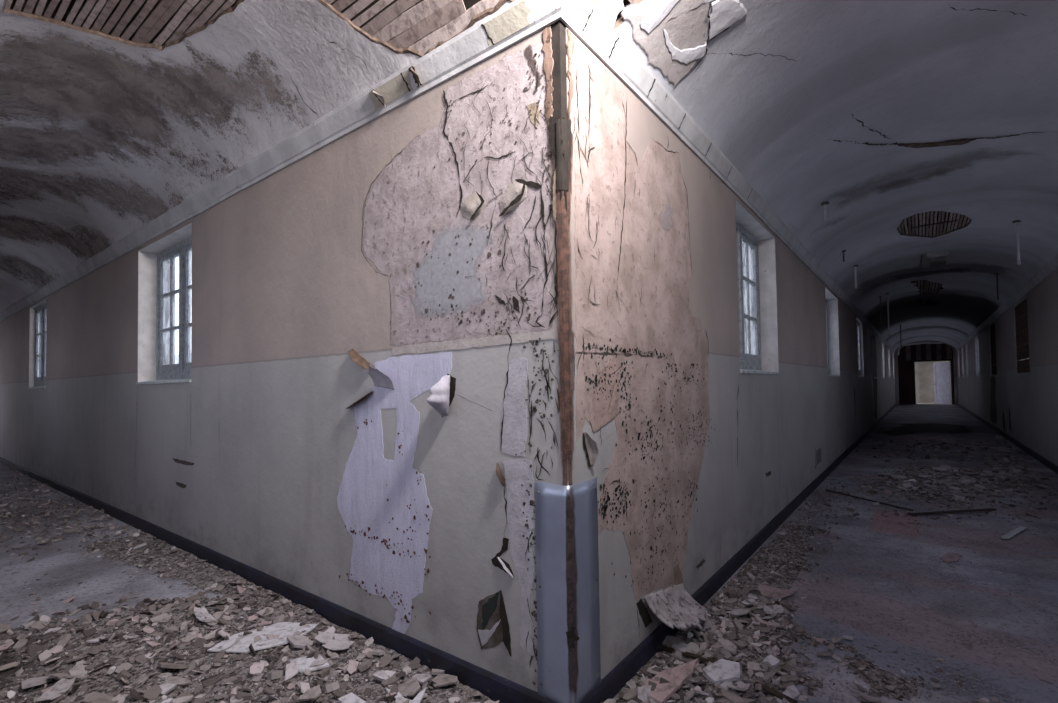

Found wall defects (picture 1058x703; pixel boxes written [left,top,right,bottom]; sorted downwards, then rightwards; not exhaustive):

peeling [0,0,309,289]
peeling [318,0,530,58]
flaking render [613,0,747,87]
crack [828,114,1043,146]
peeling [337,27,715,688]
crack [328,0,794,524]
rust [551,136,575,465]
crack [504,487,536,558]
crack [526,599,538,664]
rust [566,490,578,694]